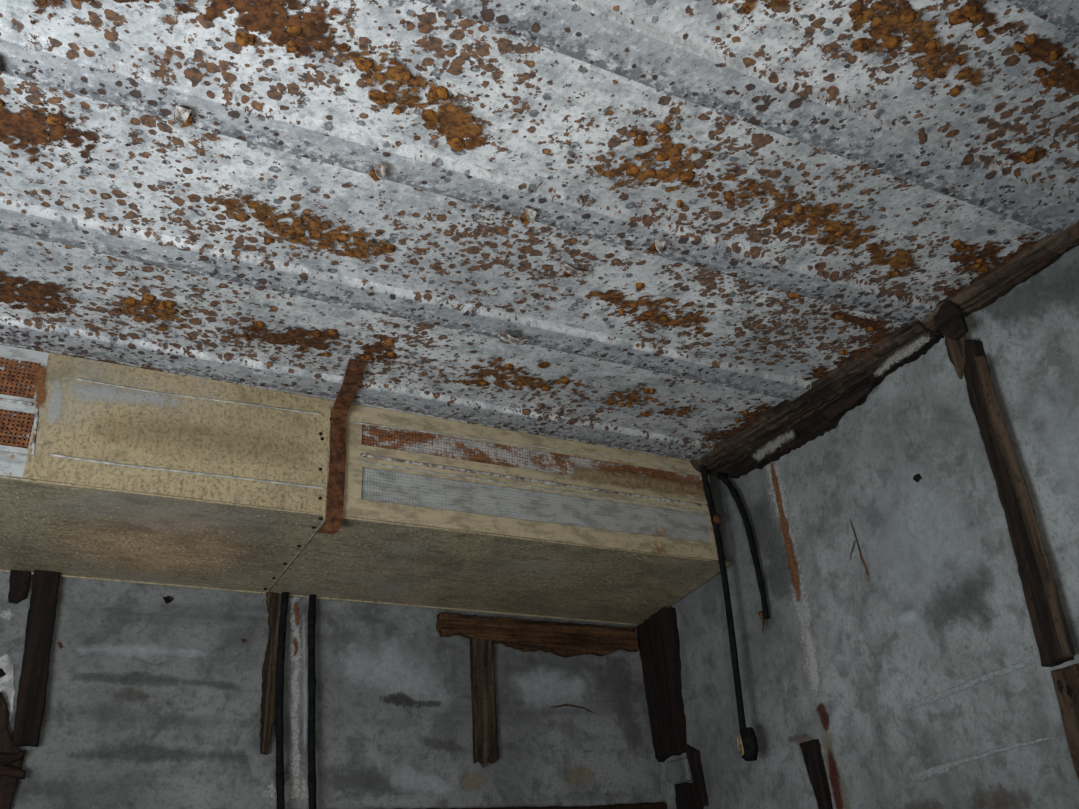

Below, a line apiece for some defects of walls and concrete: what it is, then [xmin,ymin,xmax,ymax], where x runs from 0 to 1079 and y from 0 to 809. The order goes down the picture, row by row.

corrosion [29,0,99,25]
corrosion [173,0,503,152]
corrosion [843,0,1079,100]
corrosion [0,95,111,175]
corrosion [1004,147,1058,164]
corrosion [195,188,412,264]
corrosion [586,123,1041,299]
corrosion [0,265,88,316]
corrosion [102,283,202,332]
corrosion [224,320,397,365]
corrosion [584,282,709,340]
corrosion [421,351,774,441]